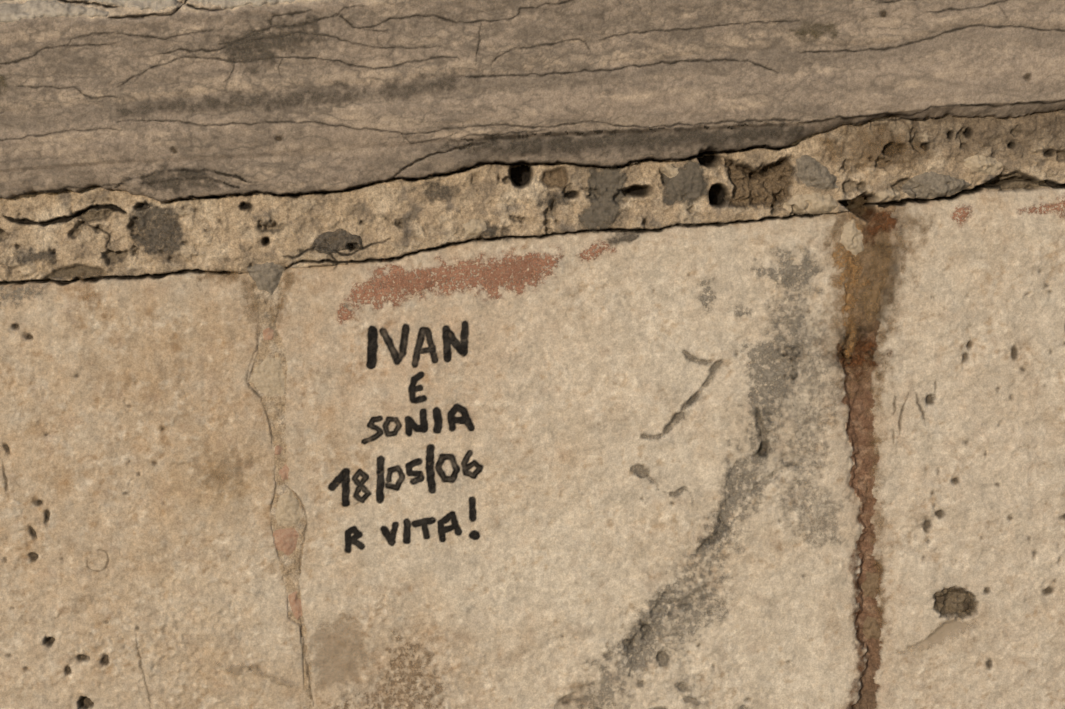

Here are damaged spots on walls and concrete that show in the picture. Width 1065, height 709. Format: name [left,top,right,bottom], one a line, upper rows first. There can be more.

crack [0,185,238,285]
crack [286,213,834,268]
crack [168,100,1065,203]
corrosion [856,210,898,243]
crack [863,186,993,208]
corrosion [829,244,878,377]
crack [641,350,723,439]
leakage [577,248,819,709]